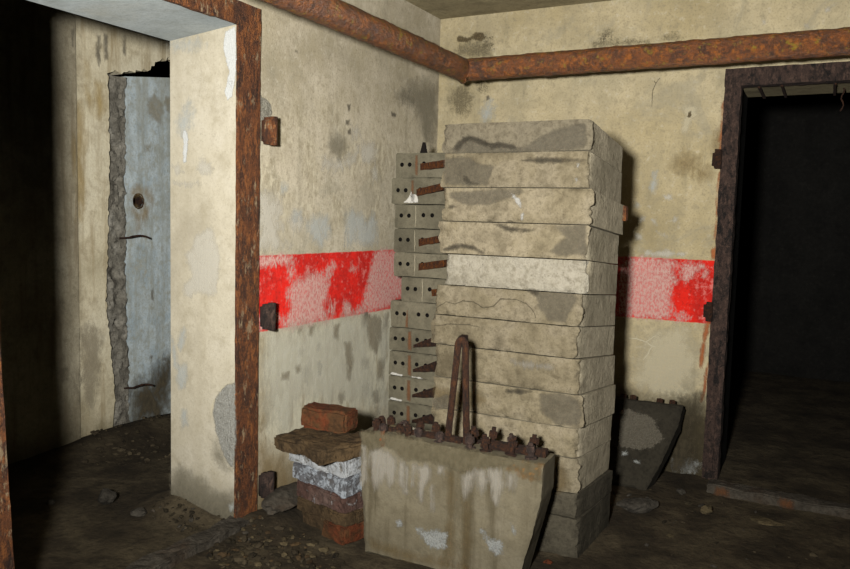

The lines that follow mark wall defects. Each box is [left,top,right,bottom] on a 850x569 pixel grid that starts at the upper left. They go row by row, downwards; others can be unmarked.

spalling [105,74,154,426]
corrosion [700,322,710,400]
peeling [213,384,237,466]
damp [360,432,539,505]
damp [416,528,448,550]
damp [480,529,503,555]